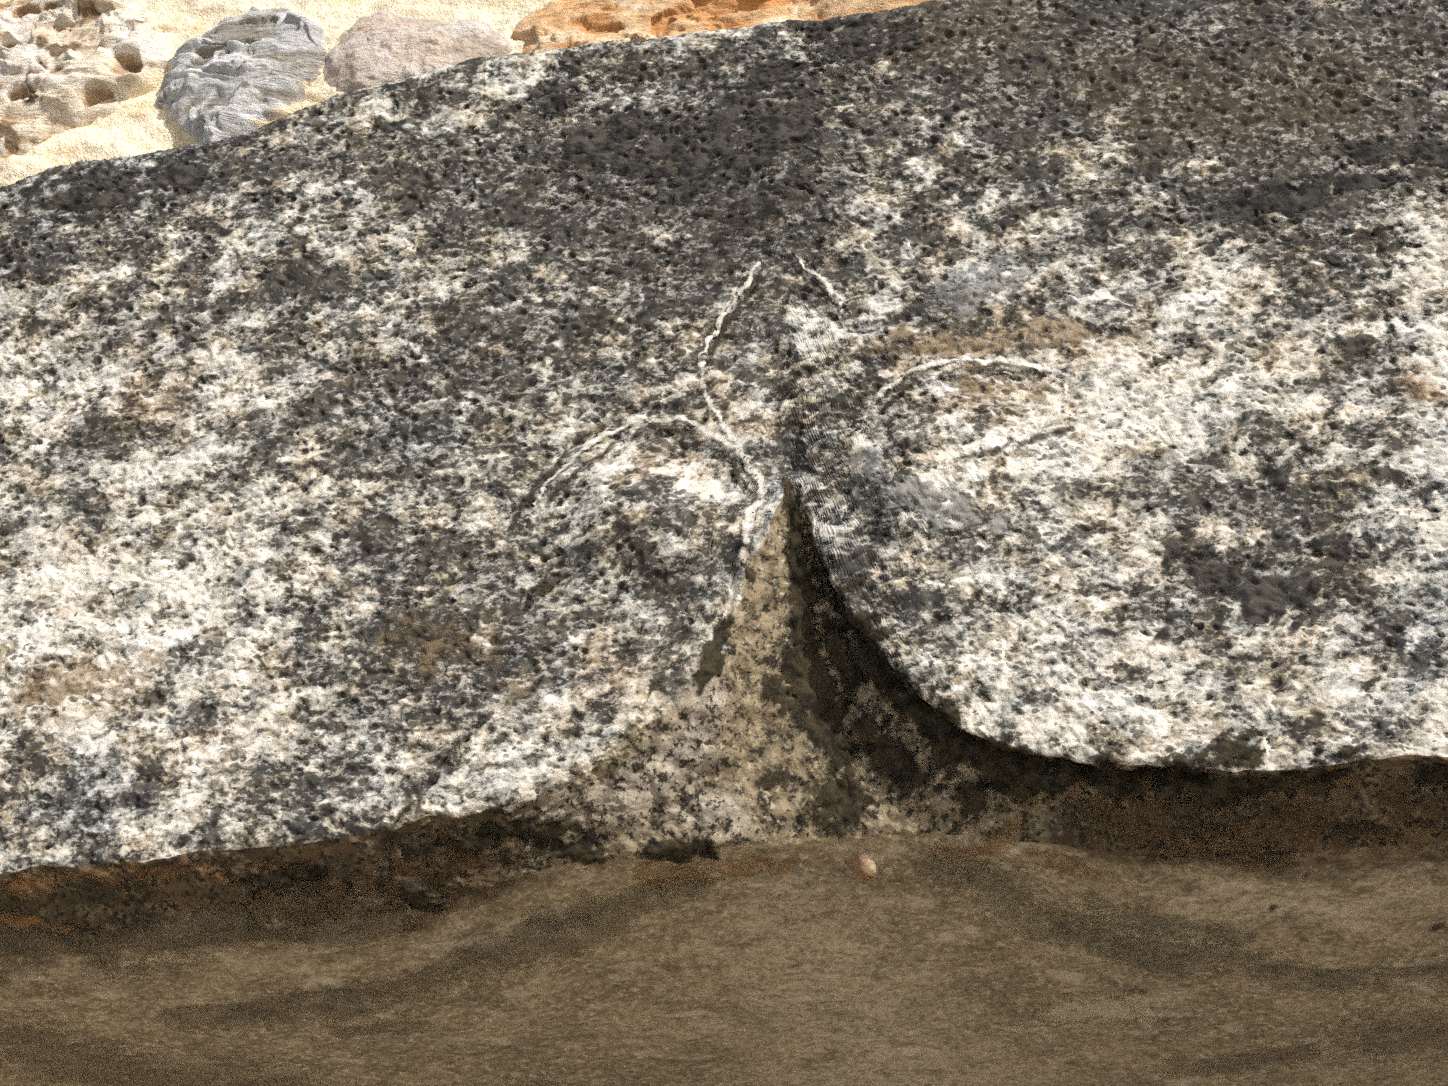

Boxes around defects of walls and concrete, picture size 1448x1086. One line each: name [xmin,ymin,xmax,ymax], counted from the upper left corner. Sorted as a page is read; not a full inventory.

crack [506,430,596,535]
crack [927,427,1070,467]
spalling [457,737,572,809]